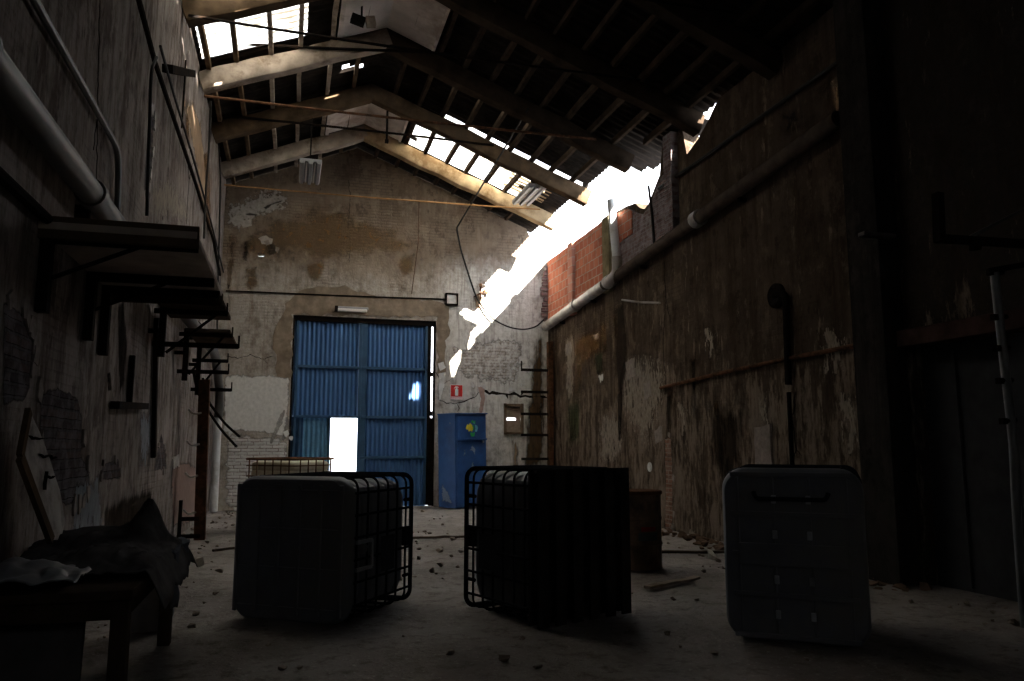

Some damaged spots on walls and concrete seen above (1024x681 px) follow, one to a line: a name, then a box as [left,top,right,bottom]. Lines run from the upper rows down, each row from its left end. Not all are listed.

peeling [227,189,288,231]
flaking render [438,333,523,400]
crack [436,373,547,411]
flaking render [36,376,122,529]
flaking render [225,430,293,511]
damp [711,409,741,481]